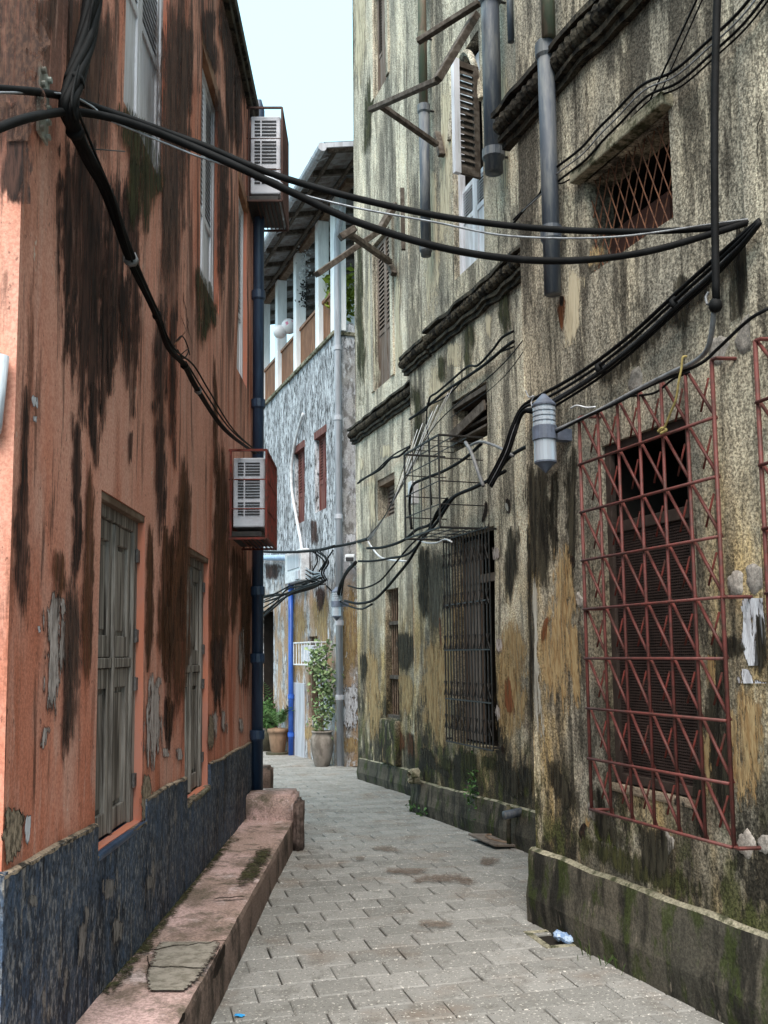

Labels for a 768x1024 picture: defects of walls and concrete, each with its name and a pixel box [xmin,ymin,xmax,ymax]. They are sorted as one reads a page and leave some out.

leakage [362,77,372,153]
leakage [52,0,246,760]
leakage [355,226,366,405]
leakage [13,384,30,633]
spalling [1,807,31,866]
peeling [38,590,66,749]
peeling [140,675,185,822]
leakage [418,546,449,636]
leakage [502,447,577,734]
leakage [639,826,673,881]
flaking render [703,732,712,795]
flaking render [730,598,766,813]